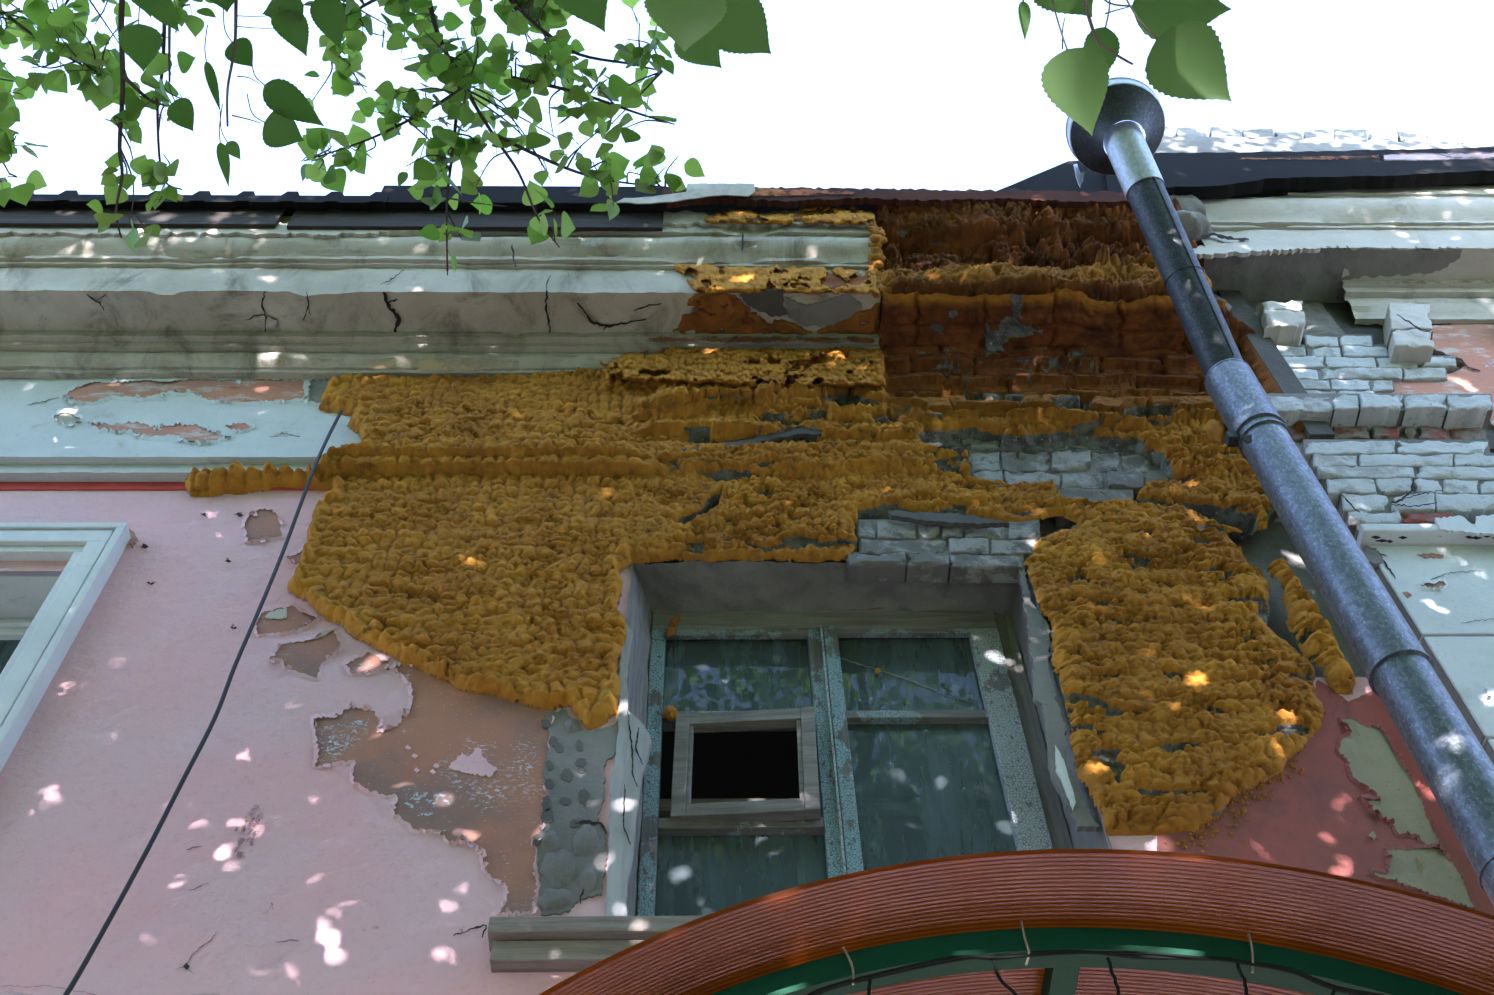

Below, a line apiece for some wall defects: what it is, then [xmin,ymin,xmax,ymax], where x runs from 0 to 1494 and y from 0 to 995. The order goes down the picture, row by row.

spalling [0,222,422,239]
crack [248,292,311,332]
crack [380,270,403,332]
crack [511,245,662,333]
spalling [663,200,1201,375]
peeling [50,376,330,447]
spalling [1267,334,1494,569]
peeling [234,505,303,568]
peeling [1403,578,1449,598]
spalling [845,438,1167,833]
peeling [230,602,619,917]
flaking render [1157,680,1494,916]